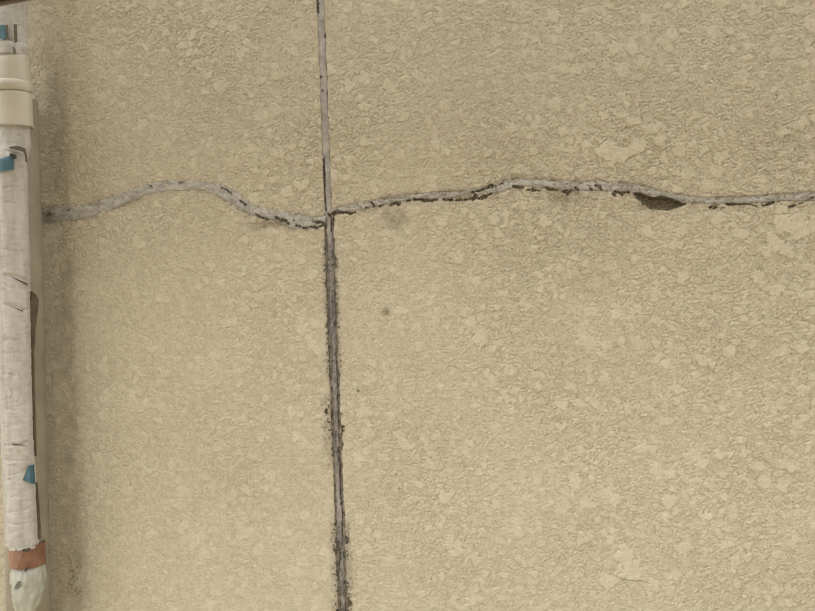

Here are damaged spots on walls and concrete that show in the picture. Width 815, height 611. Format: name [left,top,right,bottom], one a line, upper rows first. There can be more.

crack [41,178,815,231]
spalling [634,192,683,210]